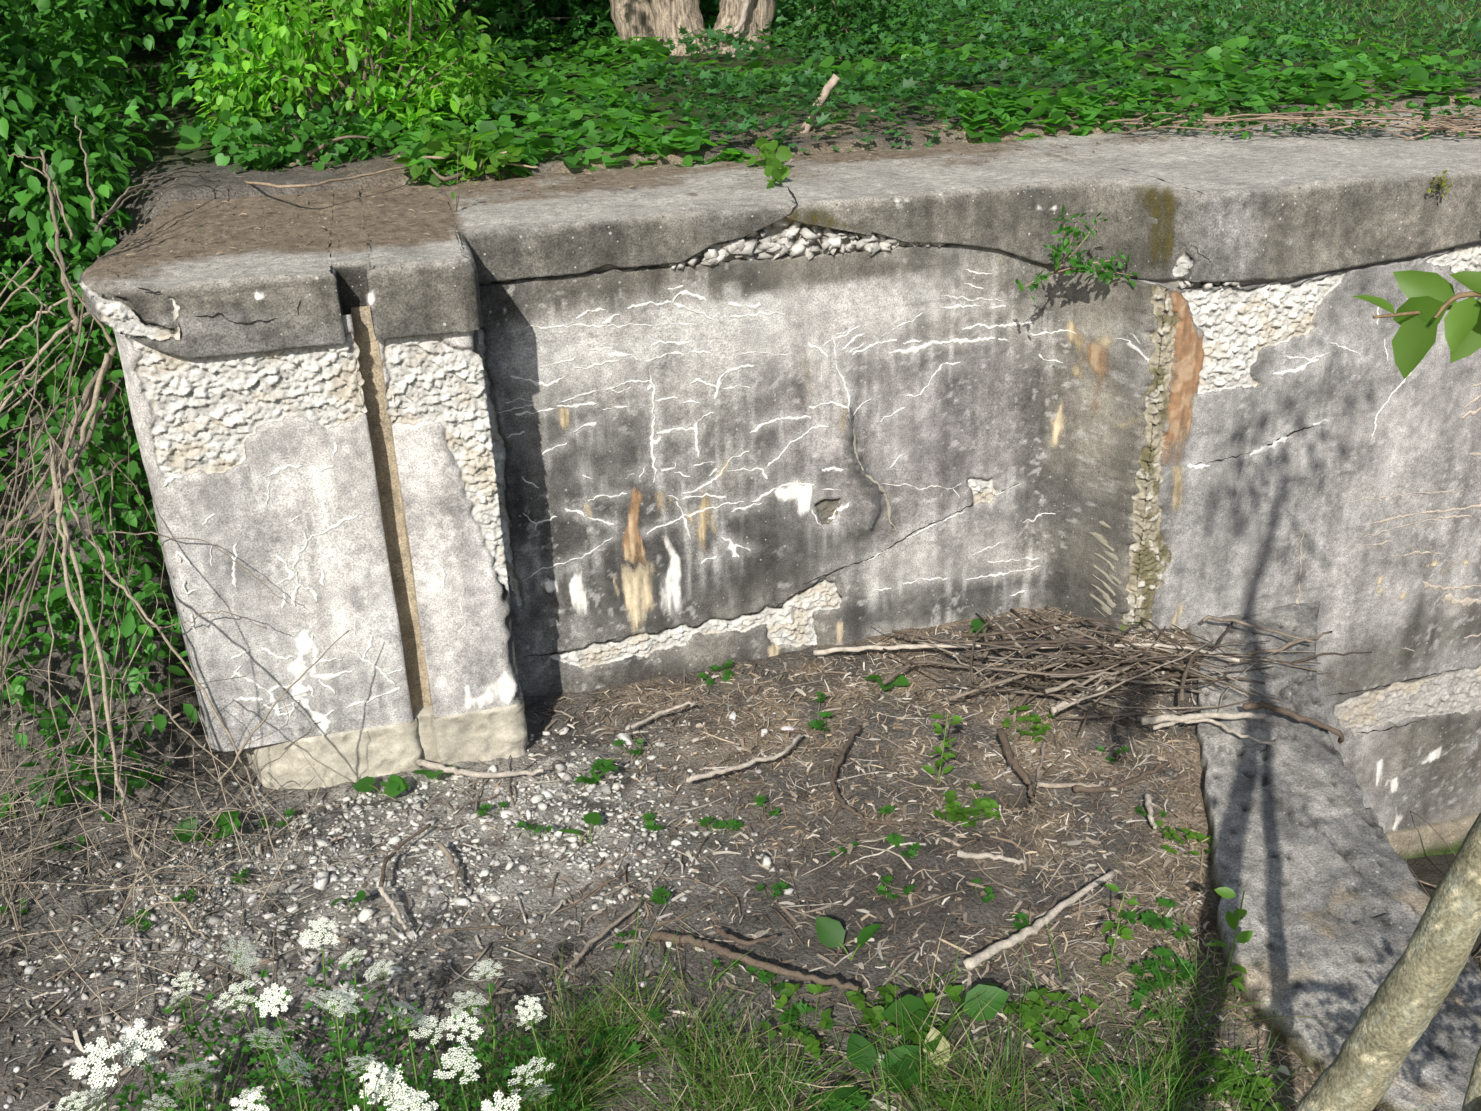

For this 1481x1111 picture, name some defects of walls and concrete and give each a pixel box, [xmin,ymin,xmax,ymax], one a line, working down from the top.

spalling [668,217,945,270]
spalling [77,280,367,477]
crack [231,442,402,735]
spalling [383,328,523,606]
leakage [544,574,587,614]
rust [622,488,652,629]
leakage [687,494,751,557]
crack [497,269,1076,600]
crack [525,483,1055,657]
leakage [1052,406,1063,445]
rust [1162,291,1204,507]
spalling [1089,253,1345,630]